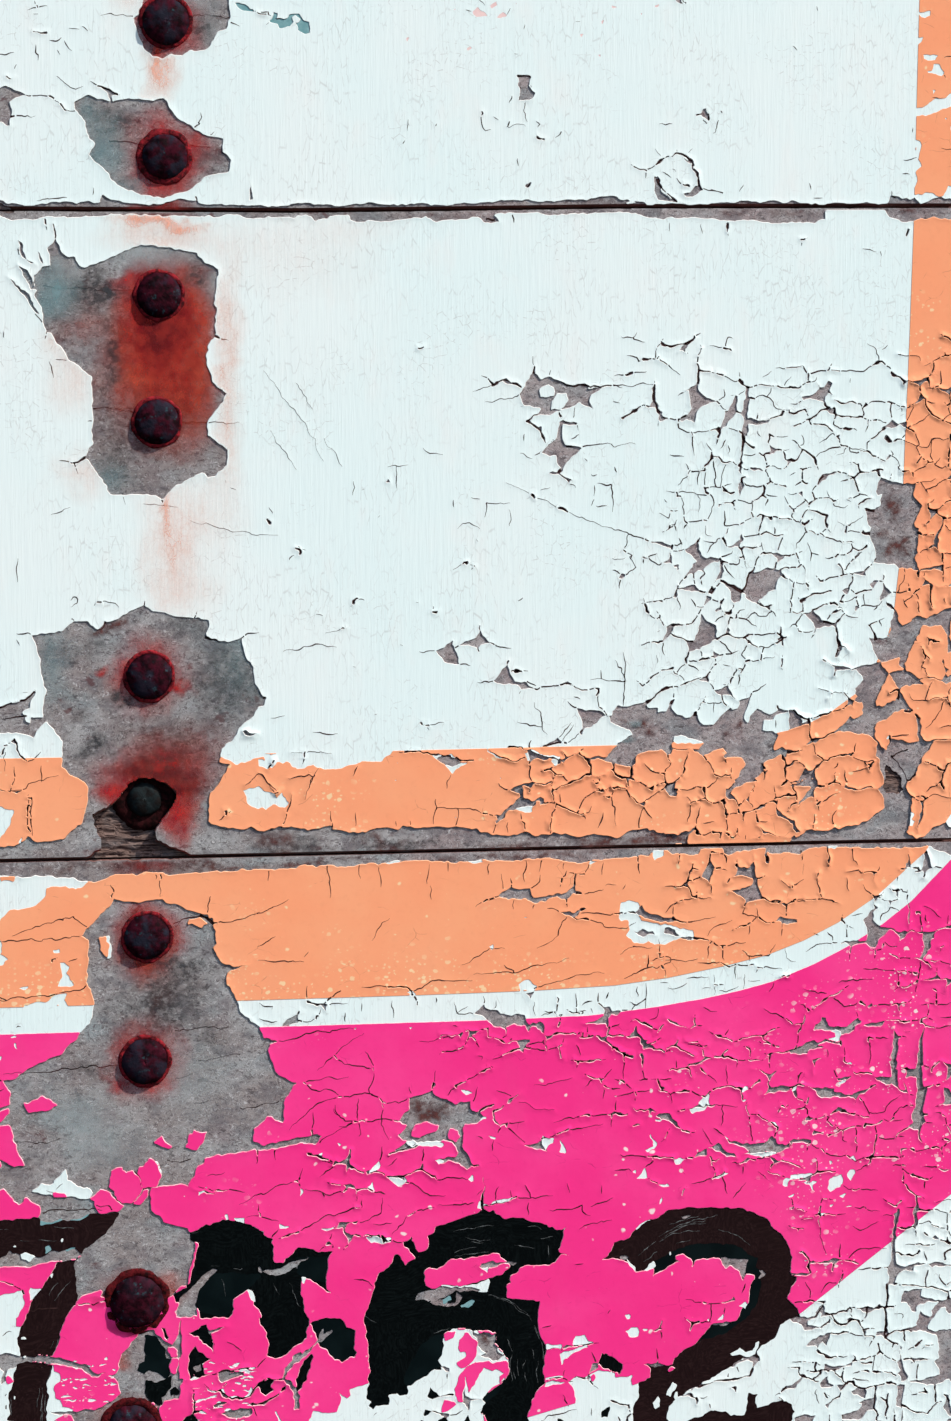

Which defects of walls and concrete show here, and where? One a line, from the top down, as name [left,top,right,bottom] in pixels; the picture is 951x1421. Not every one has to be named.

peeling [104,0,310,59]
corrosion [127,123,199,234]
peeling [0,74,951,512]
corrosion [115,269,210,449]
peeling [865,478,921,570]
corrosion [100,741,196,834]
crack [220,716,395,828]
crack [258,333,951,1421]
crack [0,1005,94,1091]
peeling [0,596,951,1421]
corrosion [104,1268,170,1334]
crack [179,1334,303,1421]